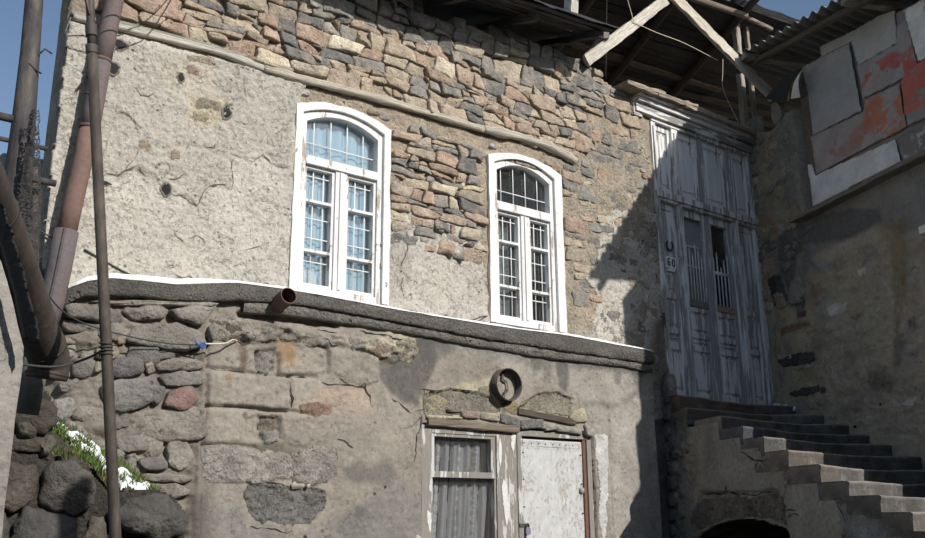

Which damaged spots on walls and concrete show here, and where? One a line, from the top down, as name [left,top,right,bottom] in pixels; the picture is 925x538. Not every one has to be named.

crack [89,144,292,210]
spalling [767,275,788,306]
spalling [300,401,332,417]
crack [277,375,371,407]
water stain [382,338,446,401]
crack [393,388,479,462]
spalling [778,351,815,370]
spalling [789,384,826,397]
spalling [201,414,337,525]
peeling [502,479,510,527]
peeling [498,433,516,466]
peeling [594,434,609,538]